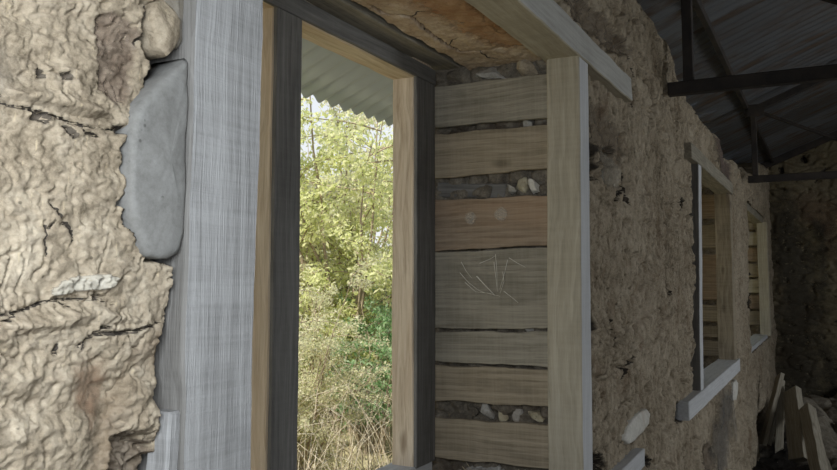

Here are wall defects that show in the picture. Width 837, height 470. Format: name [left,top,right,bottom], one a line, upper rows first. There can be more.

crack [0,103,127,138]
crack [43,202,73,256]
crack [0,297,114,322]
crack [52,322,161,356]